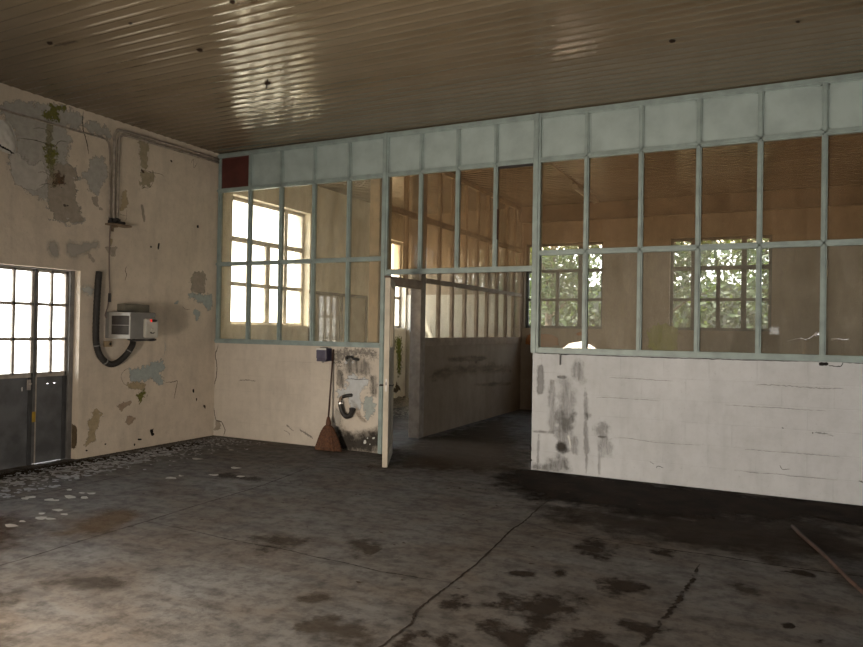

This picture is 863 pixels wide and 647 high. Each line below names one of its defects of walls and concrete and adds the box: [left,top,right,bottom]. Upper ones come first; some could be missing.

peeling [0,99,112,227]
peeling [137,141,162,189]
peeling [174,270,213,321]
peeling [117,346,166,425]
damp [334,347,377,394]
flaking render [71,409,106,451]
damp [335,410,378,453]
damp [533,363,588,470]
crack [0,467,863,647]